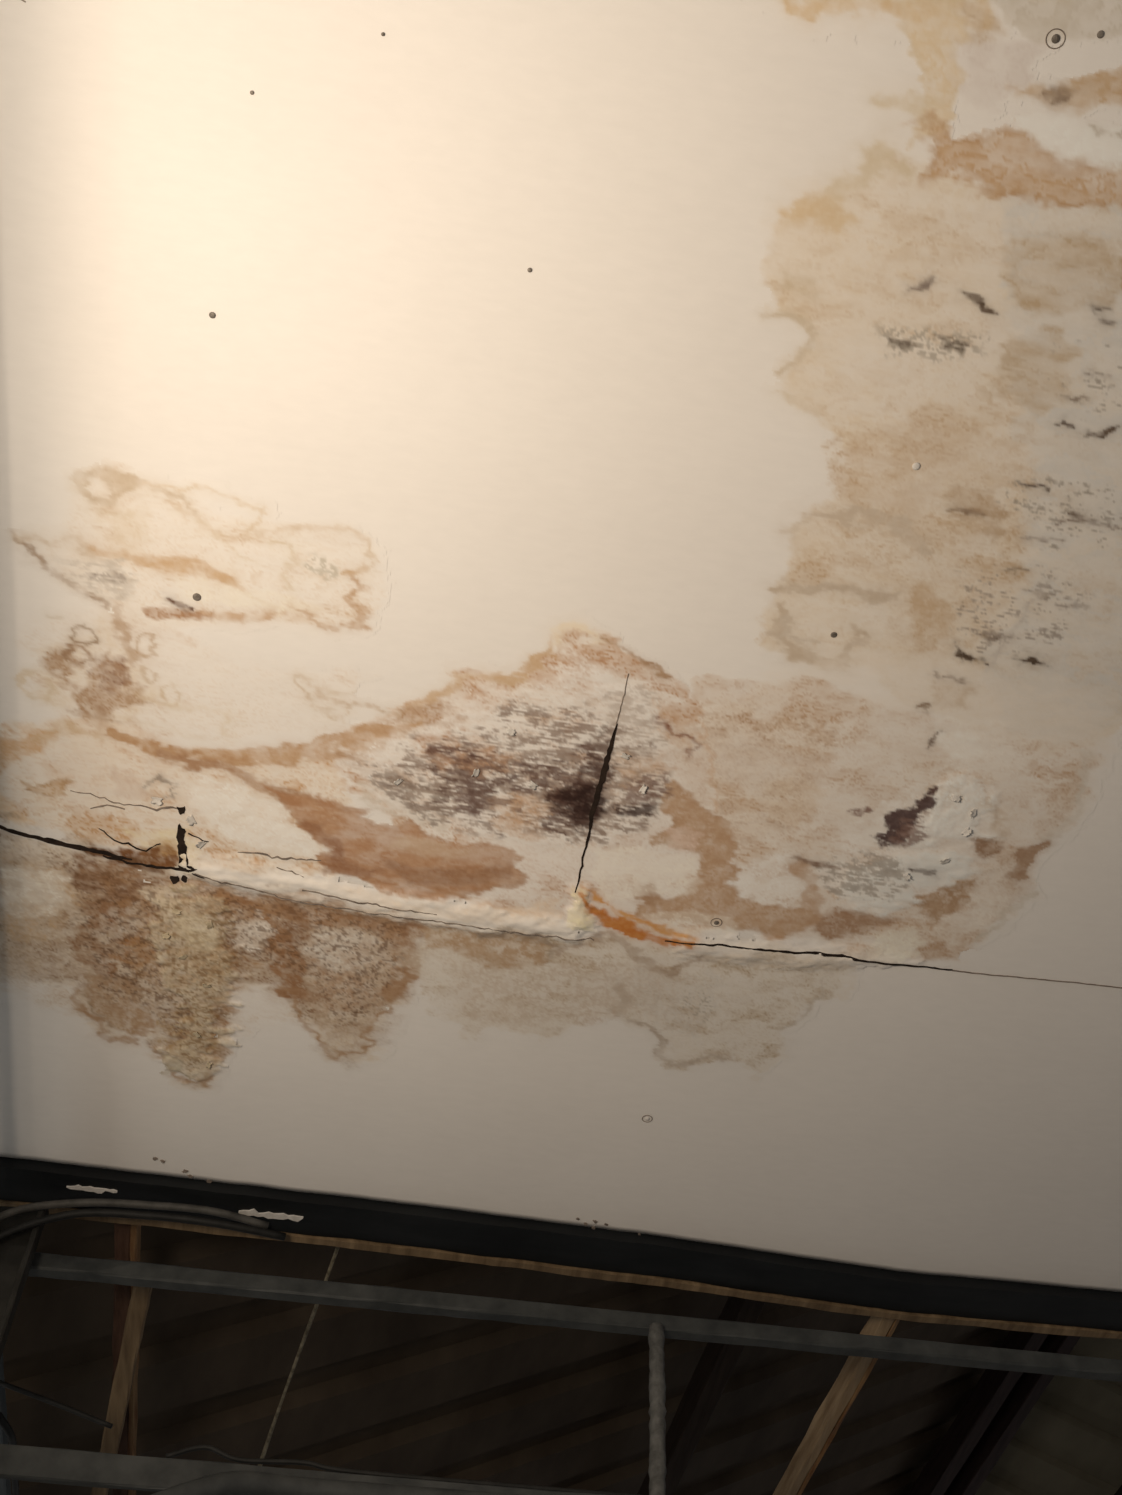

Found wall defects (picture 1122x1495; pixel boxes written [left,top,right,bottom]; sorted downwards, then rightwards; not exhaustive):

damp [0,0,1122,1095]
peeling [144,797,243,1082]
crack [0,790,594,941]
crack [575,673,629,893]
corrosion [578,882,699,950]
crack [665,940,1122,989]